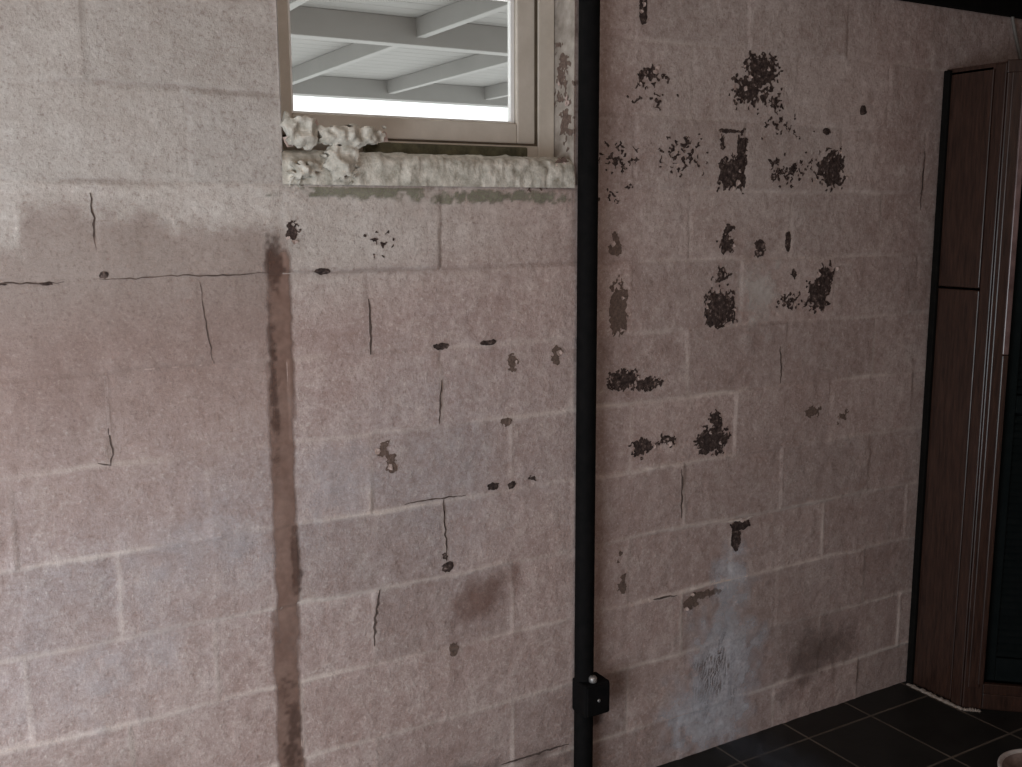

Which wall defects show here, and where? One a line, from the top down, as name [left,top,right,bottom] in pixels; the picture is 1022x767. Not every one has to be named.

water stain [667,610,754,746]